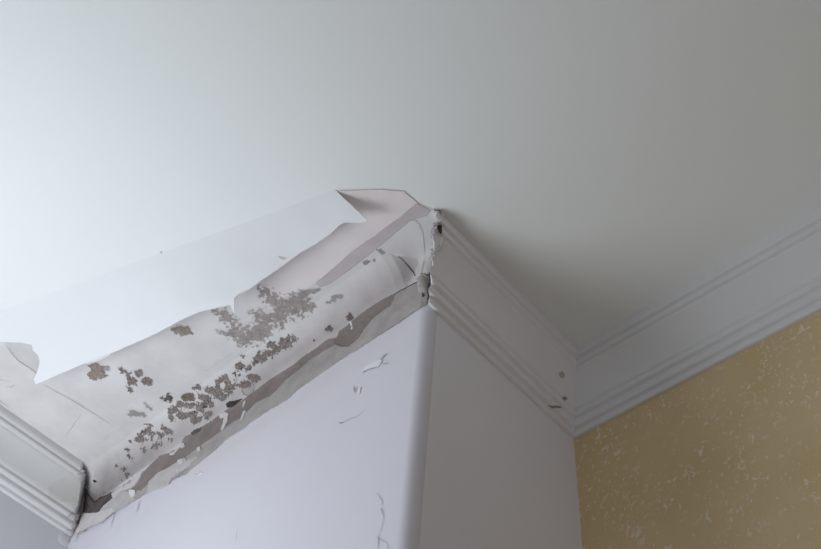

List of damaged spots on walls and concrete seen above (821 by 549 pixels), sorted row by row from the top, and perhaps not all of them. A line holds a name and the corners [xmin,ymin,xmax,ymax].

peeling [0,189,445,536]
damp [212,284,320,347]
damp [154,305,428,498]